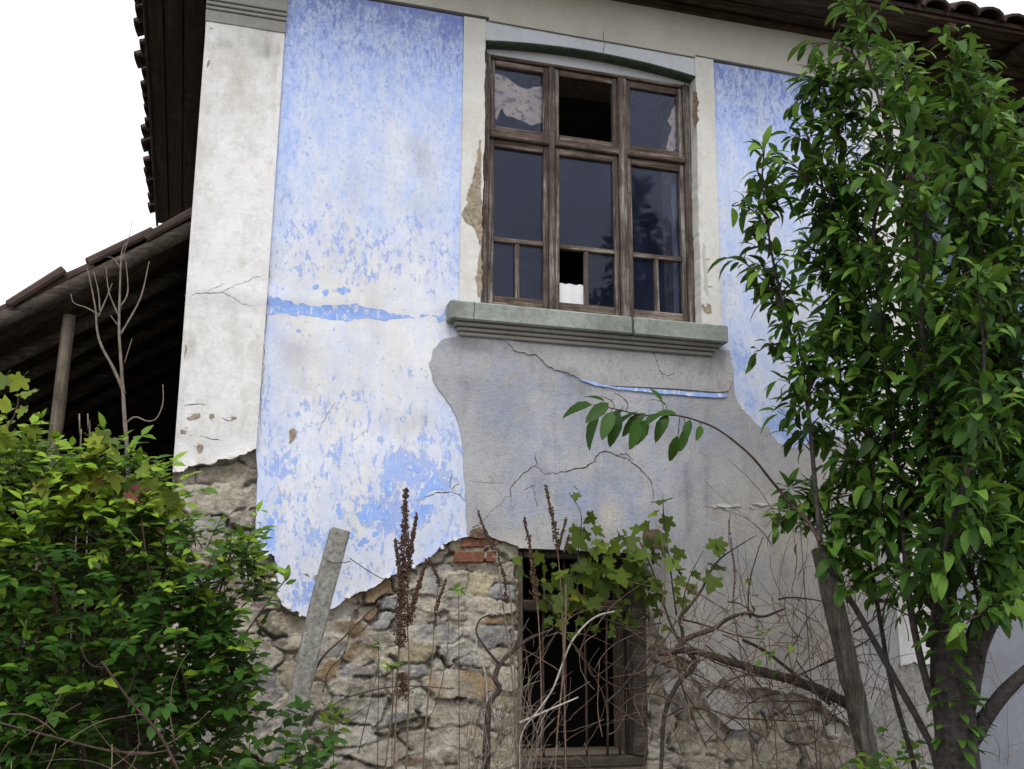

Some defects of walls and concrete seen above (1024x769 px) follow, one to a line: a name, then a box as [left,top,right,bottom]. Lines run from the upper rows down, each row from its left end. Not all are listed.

peeling [462,140,483,297]
crack [193,266,270,449]
spalling [180,412,215,463]
crack [423,450,654,521]
peeling [349,531,379,546]
flaking render [440,525,503,563]